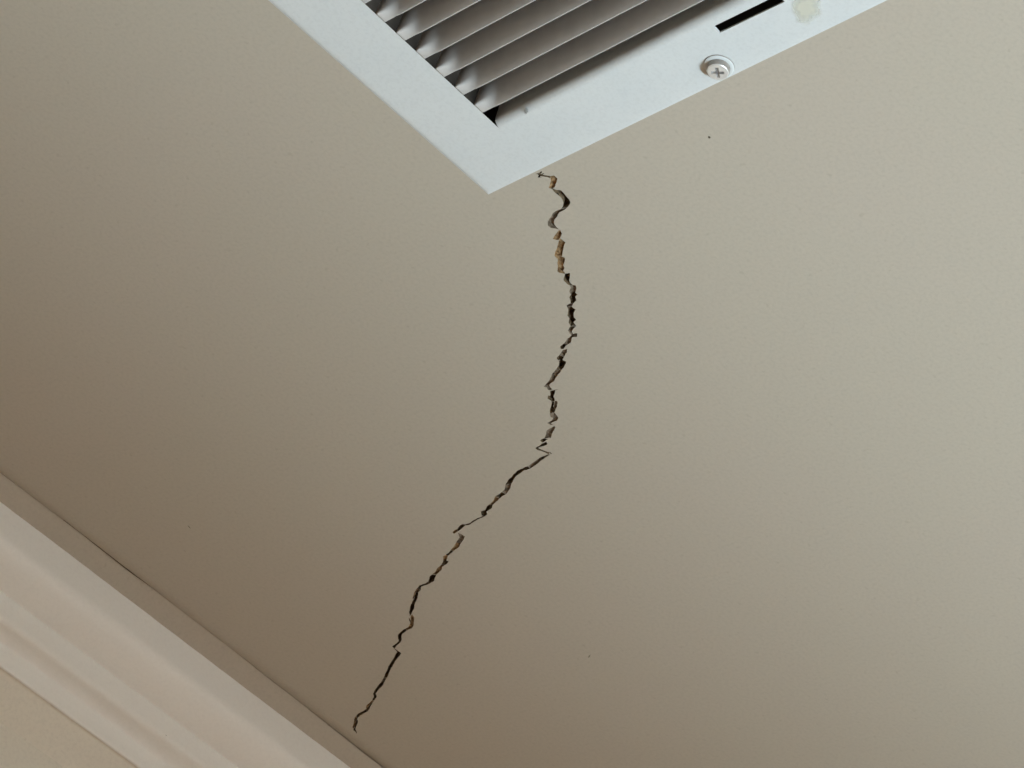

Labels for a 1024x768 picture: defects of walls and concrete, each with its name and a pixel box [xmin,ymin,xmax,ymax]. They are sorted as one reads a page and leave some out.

crack [353,171,578,733]